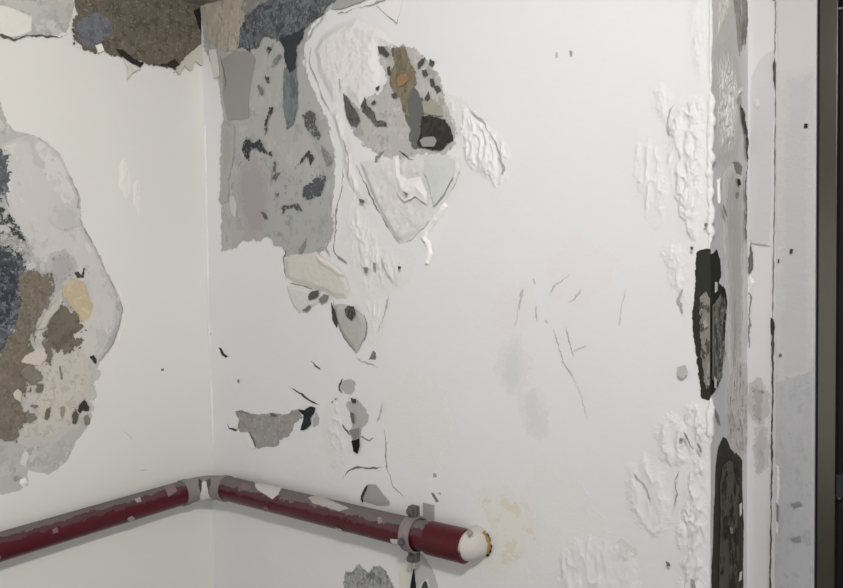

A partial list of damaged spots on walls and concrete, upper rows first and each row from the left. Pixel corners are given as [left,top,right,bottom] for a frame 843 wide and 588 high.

crack [0,33,62,41]
crack [302,0,385,108]
flaking render [0,0,336,252]
spalling [0,191,93,495]
flaking render [79,219,124,364]
peeling [281,246,367,354]
flaking render [690,247,727,400]
flaking render [227,409,302,449]
flaking render [338,379,369,454]
spalling [360,484,390,506]
flaking render [711,437,744,588]
flaking render [343,554,438,588]